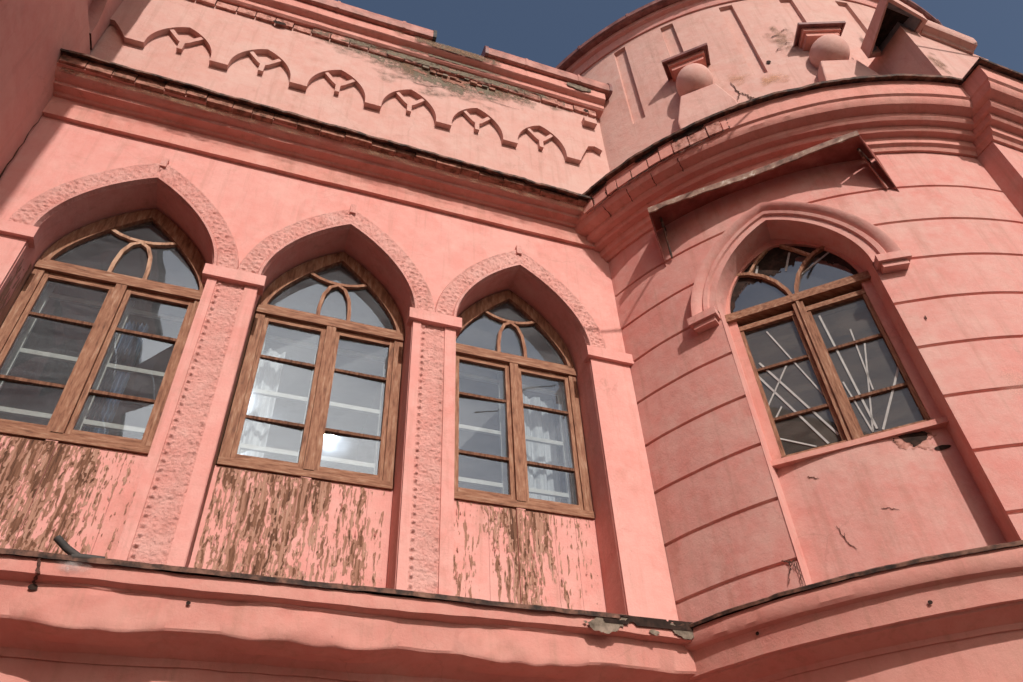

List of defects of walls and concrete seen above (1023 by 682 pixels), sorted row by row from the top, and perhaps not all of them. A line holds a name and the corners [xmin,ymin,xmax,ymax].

leakage [315,31,547,103]
peeling [0,259,32,328]
peeling [189,308,387,587]
flaking render [888,431,951,451]
peeling [0,435,136,559]
peeling [453,501,598,609]
crack [781,560,803,586]
spalling [584,591,699,639]